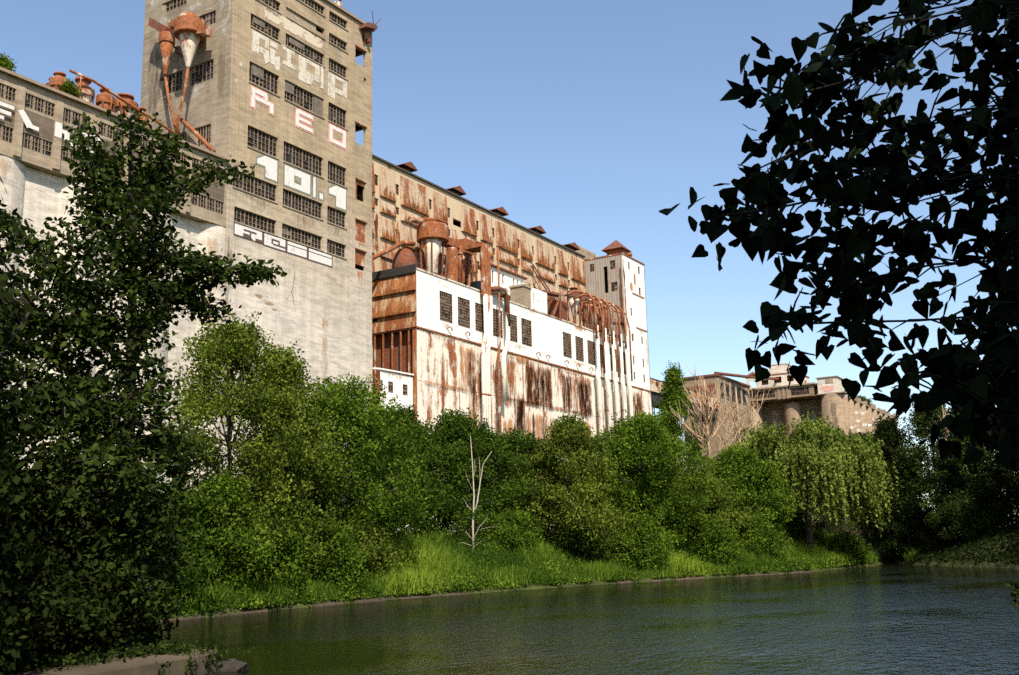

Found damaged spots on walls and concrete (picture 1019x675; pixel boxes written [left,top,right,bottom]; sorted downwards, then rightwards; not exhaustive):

rust [372,182,448,251]
rust [464,220,586,291]
rust [374,279,411,318]
rust [600,260,635,343]
rust [425,334,477,425]
rust [504,346,604,466]